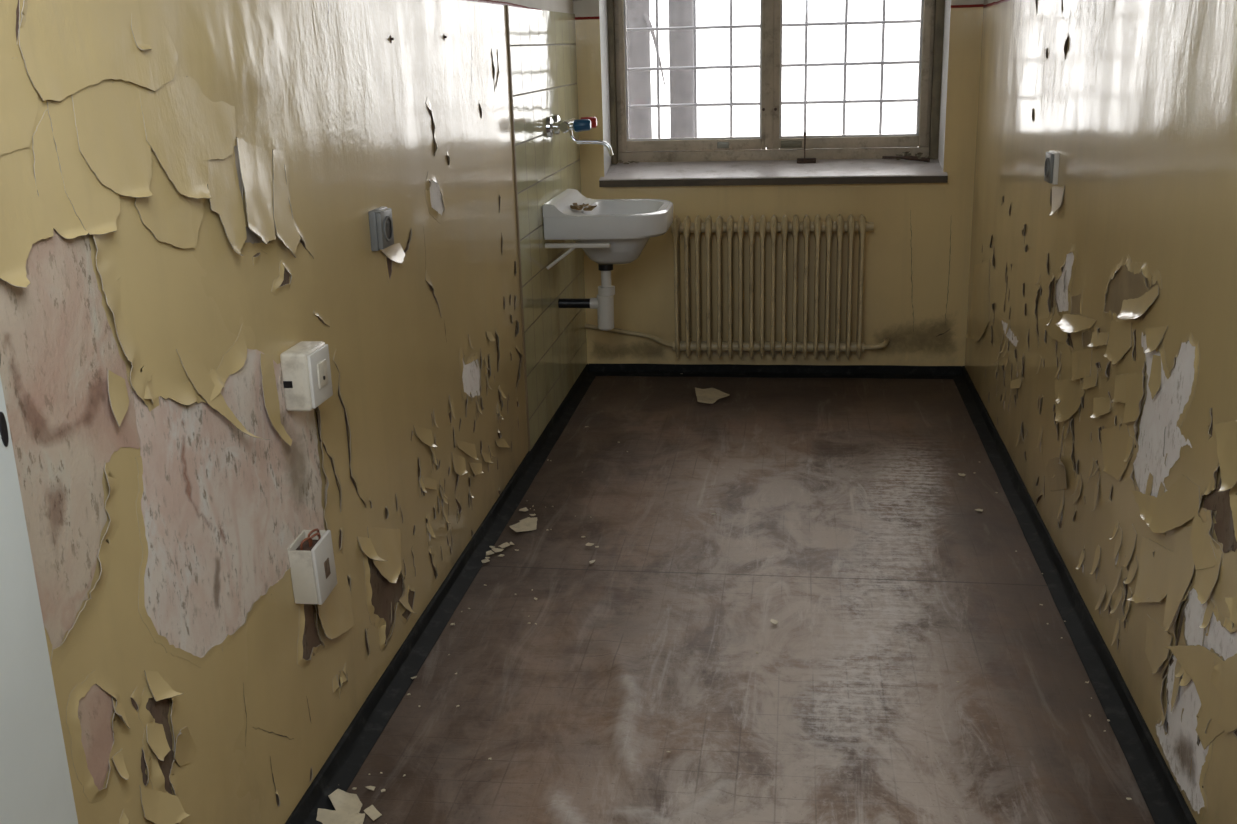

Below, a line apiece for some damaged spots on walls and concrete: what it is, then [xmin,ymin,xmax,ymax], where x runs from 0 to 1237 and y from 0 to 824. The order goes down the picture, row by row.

peeling [1050,185,1065,215]
peeling [0,0,523,673]
peeling [509,517,537,532]
peeling [988,244,1237,821]
peeling [66,670,197,824]